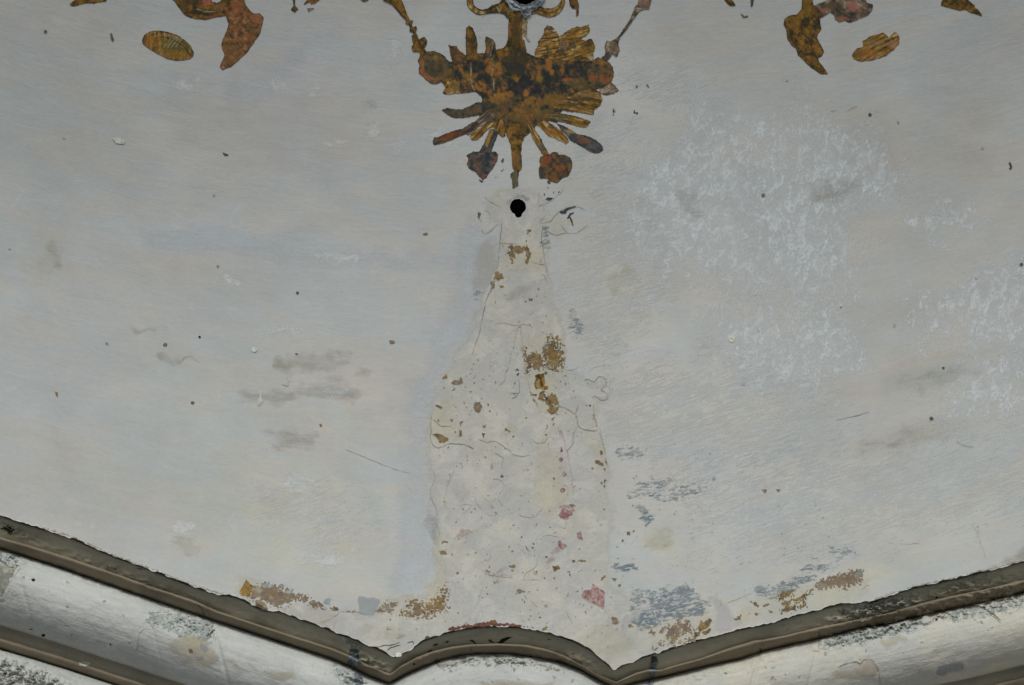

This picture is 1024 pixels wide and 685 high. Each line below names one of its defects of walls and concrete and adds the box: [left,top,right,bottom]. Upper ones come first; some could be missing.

peeling [239,181,712,673]
crack [430,404,607,493]
peeling [734,558,1024,649]